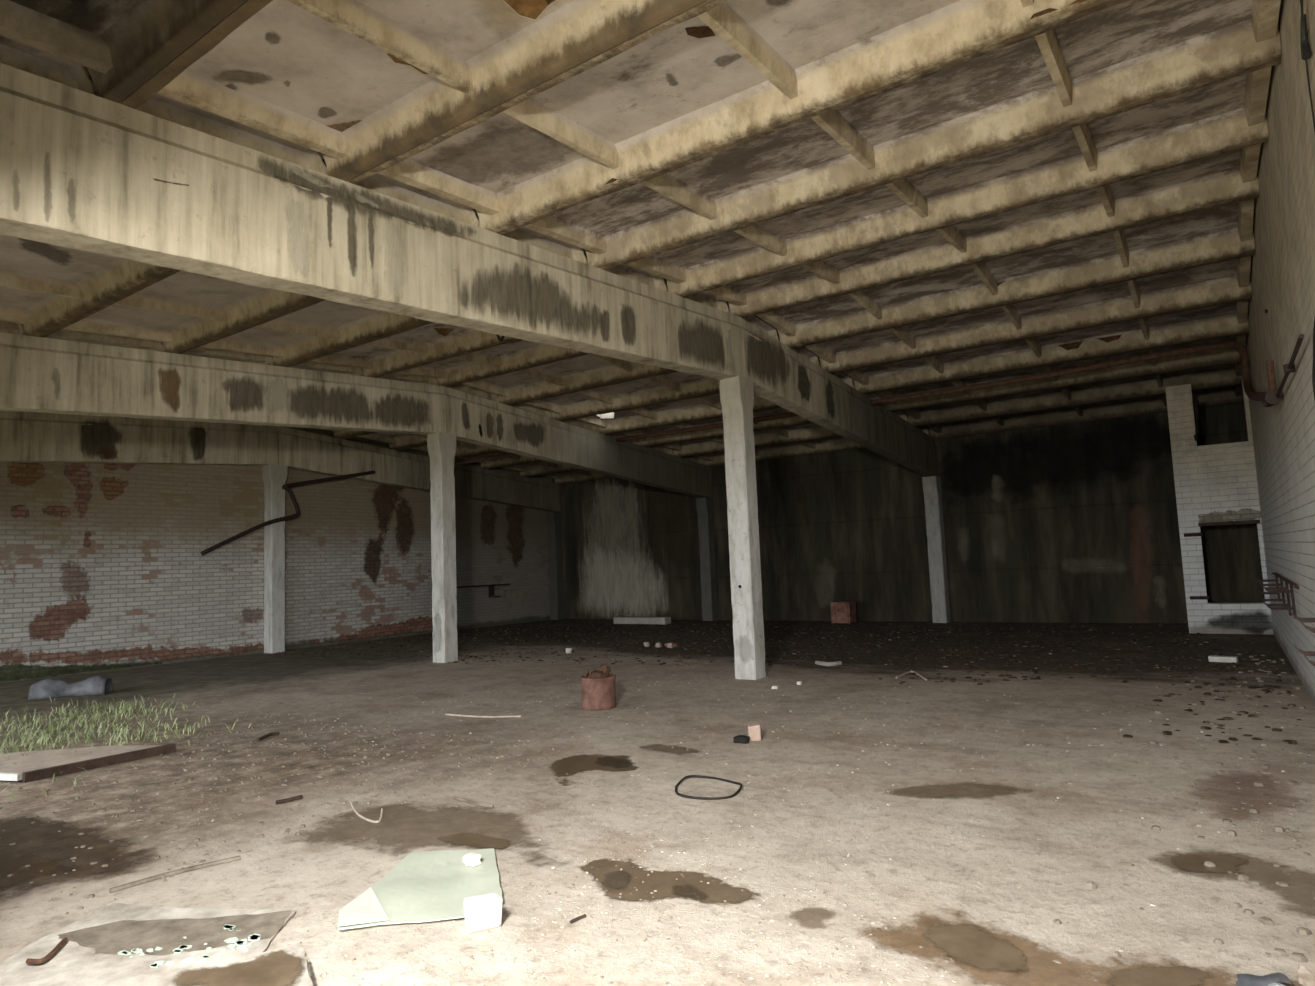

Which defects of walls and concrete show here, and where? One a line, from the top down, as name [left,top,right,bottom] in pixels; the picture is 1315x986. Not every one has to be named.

spalling [504,0,556,19]
leakage [427,127,566,184]
leakage [260,160,473,274]
leakage [21,238,70,265]
leakage [462,264,635,345]
leakage [291,386,430,428]
leakage [81,420,121,459]
flaking render [8,462,136,547]
leakage [581,478,697,617]
flaking render [0,560,264,666]
flaking render [309,616,433,644]